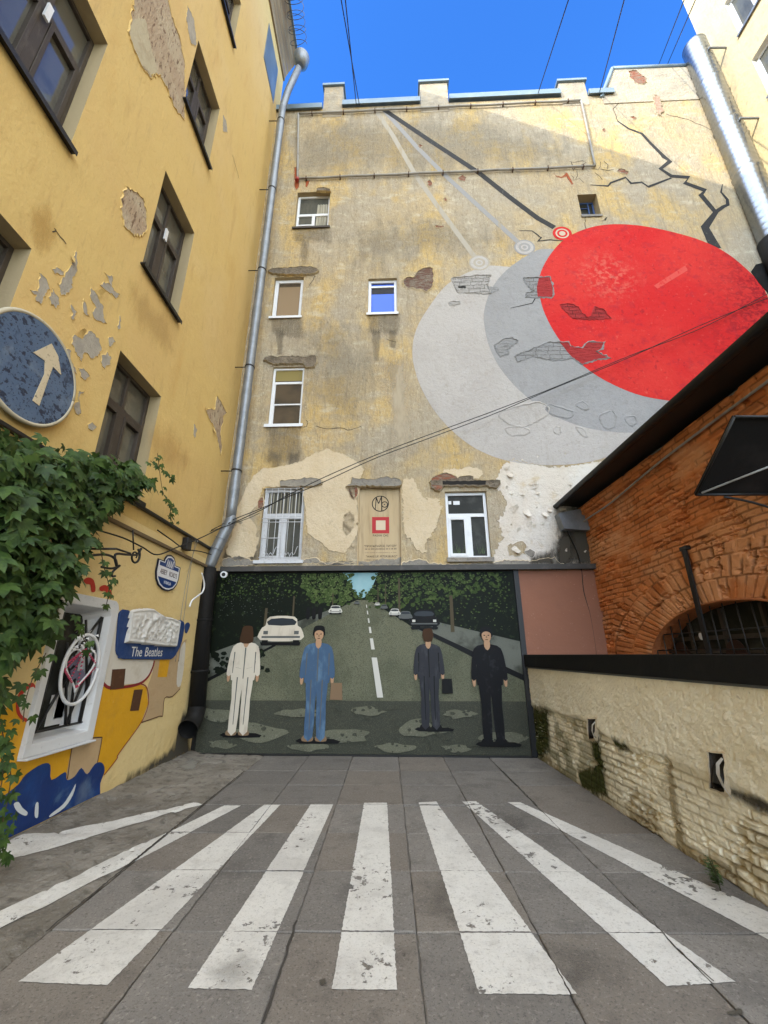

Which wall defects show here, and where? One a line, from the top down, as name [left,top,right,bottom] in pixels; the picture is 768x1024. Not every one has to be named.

spalling [127,0,197,121]
spalling [120,185,148,239]
flaking render [401,266,436,293]
peeling [30,251,121,431]
spalling [205,395,227,456]
peeling [222,448,602,566]